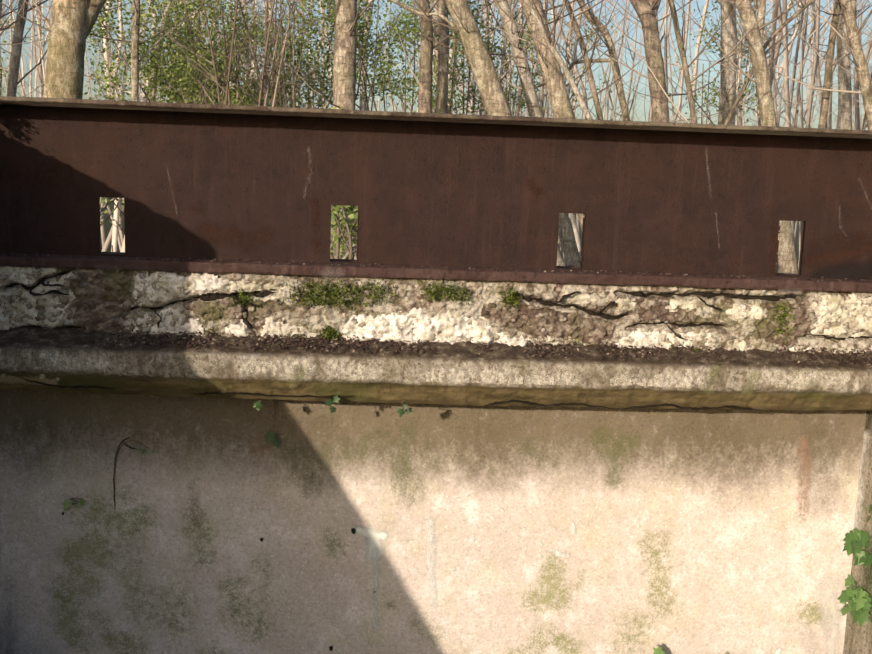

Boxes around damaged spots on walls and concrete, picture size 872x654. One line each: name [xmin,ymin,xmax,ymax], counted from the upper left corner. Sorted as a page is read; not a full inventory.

crack [4,269,72,296]
spalling [0,266,328,338]
crack [126,291,275,332]
peeling [340,292,872,354]
crack [519,291,804,340]
crack [796,334,872,342]
leakage [812,263,872,280]
crack [22,378,115,389]
leakage [0,389,872,528]
leakage [355,527,387,629]